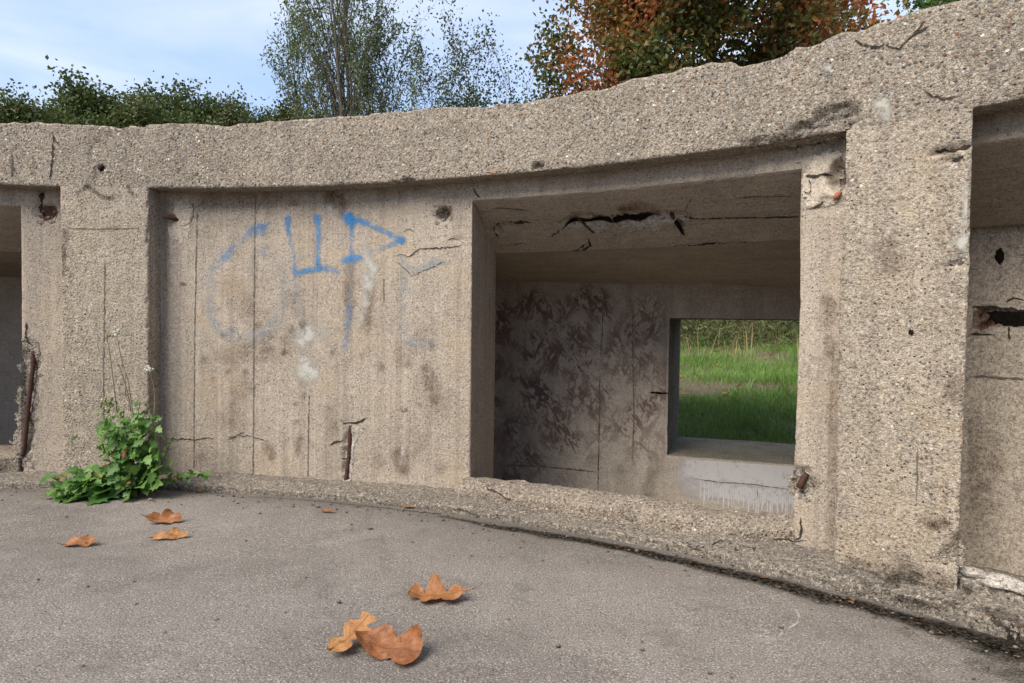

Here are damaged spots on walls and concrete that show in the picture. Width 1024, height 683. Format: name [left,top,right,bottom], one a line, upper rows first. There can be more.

crack [855,19,928,50]
peeling [769,104,863,209]
crack [474,173,833,251]
crack [383,229,465,304]
spalling [9,336,42,469]